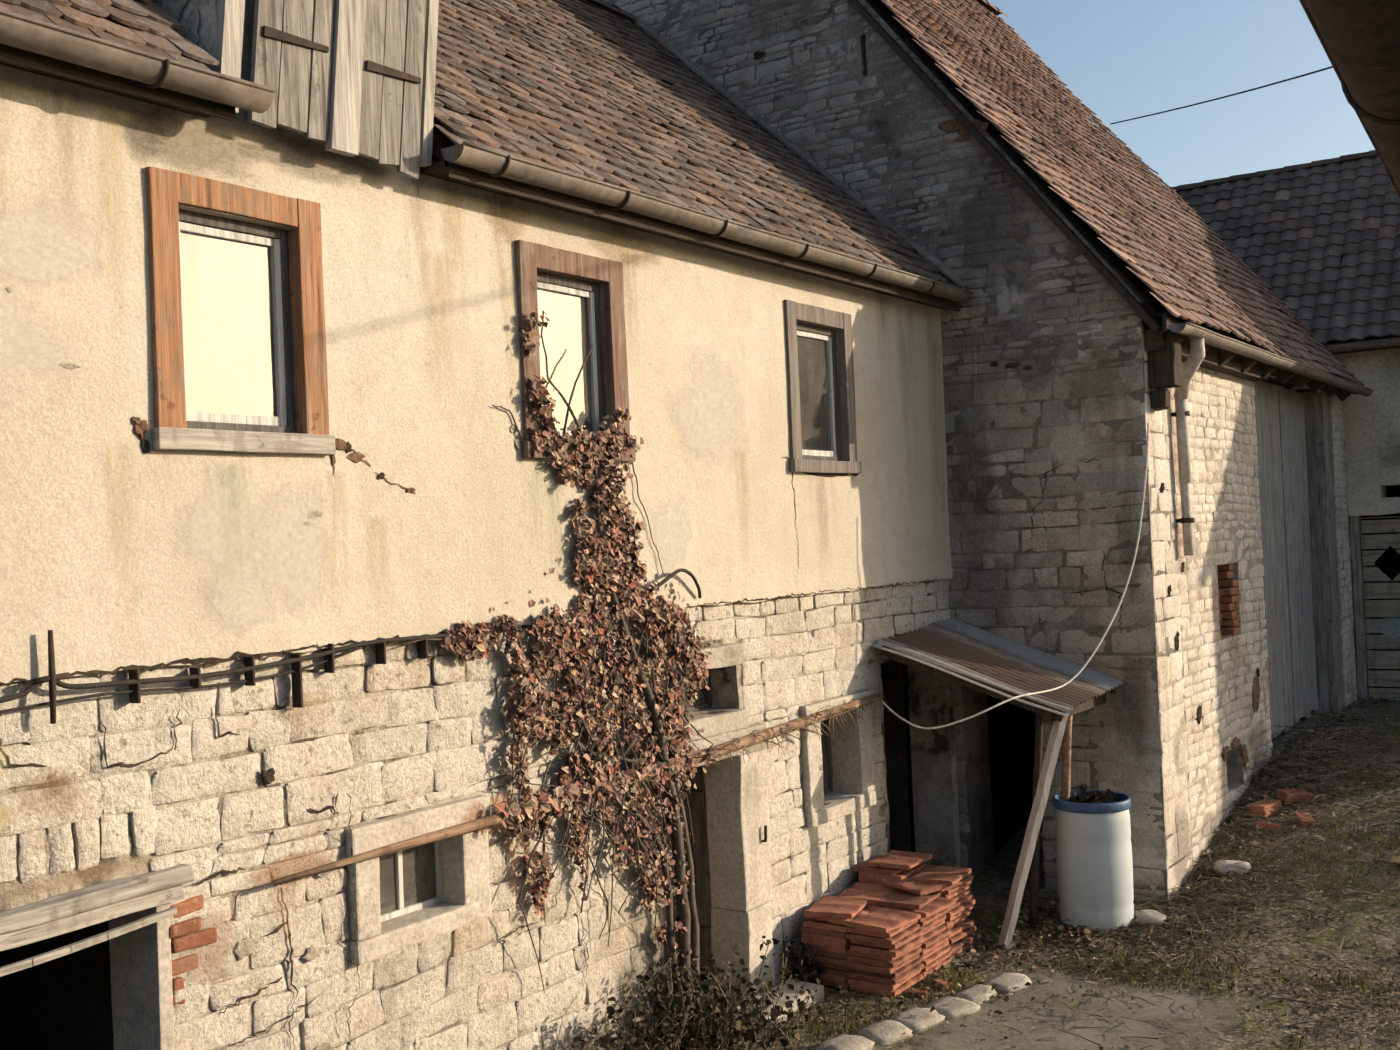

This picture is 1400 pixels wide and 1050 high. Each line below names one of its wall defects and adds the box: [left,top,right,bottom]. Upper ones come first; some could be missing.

crack [215,706,240,738]
crack [0,738,47,767]
crack [100,709,182,768]
crack [195,867,246,886]
crack [220,793,360,1050]